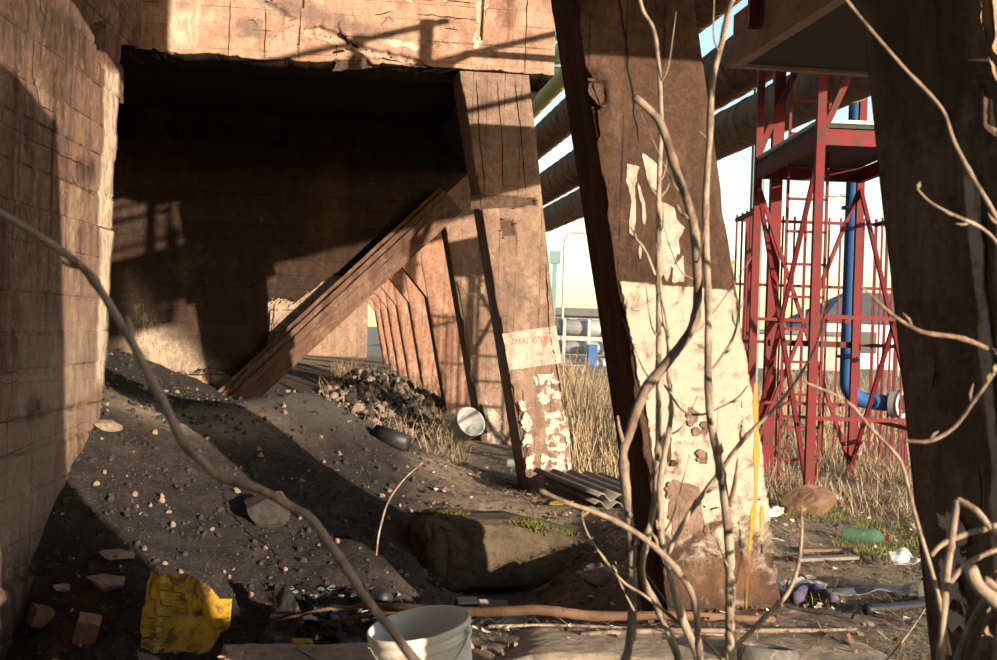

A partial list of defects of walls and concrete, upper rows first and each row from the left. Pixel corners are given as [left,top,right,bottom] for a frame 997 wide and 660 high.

spalling [233,0,423,71]
crack [228,0,434,68]
crack [418,0,475,30]
crack [522,0,530,60]
spalling [980,0,997,80]
crack [476,79,526,191]
peeling [519,373,571,481]